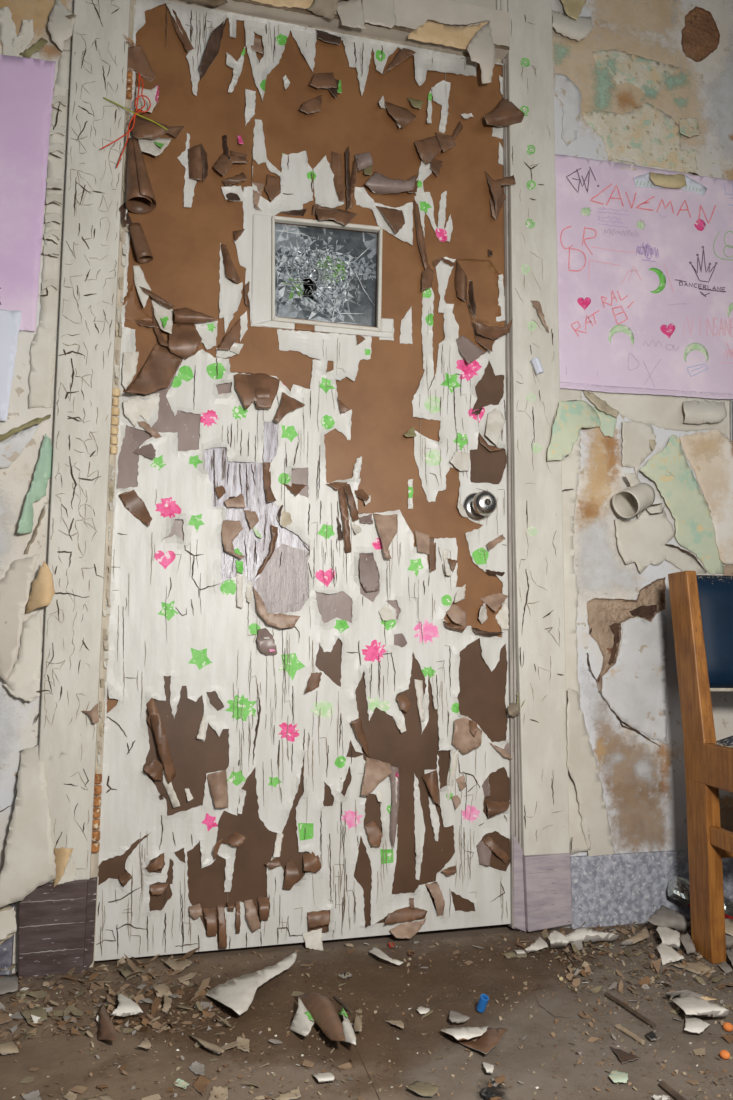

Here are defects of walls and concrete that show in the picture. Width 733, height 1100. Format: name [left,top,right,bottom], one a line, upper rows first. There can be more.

crack [354,0,383,74]
flaking render [681,6,720,62]
peeling [0,0,77,702]
peeling [82,589,117,785]
crack [20,0,218,869]
peeling [98,832,151,887]
crack [213,340,352,587]
crack [227,602,396,948]
peeling [108,0,525,950]
crack [362,540,573,918]
crack [419,147,661,747]
flaking render [547,388,733,856]